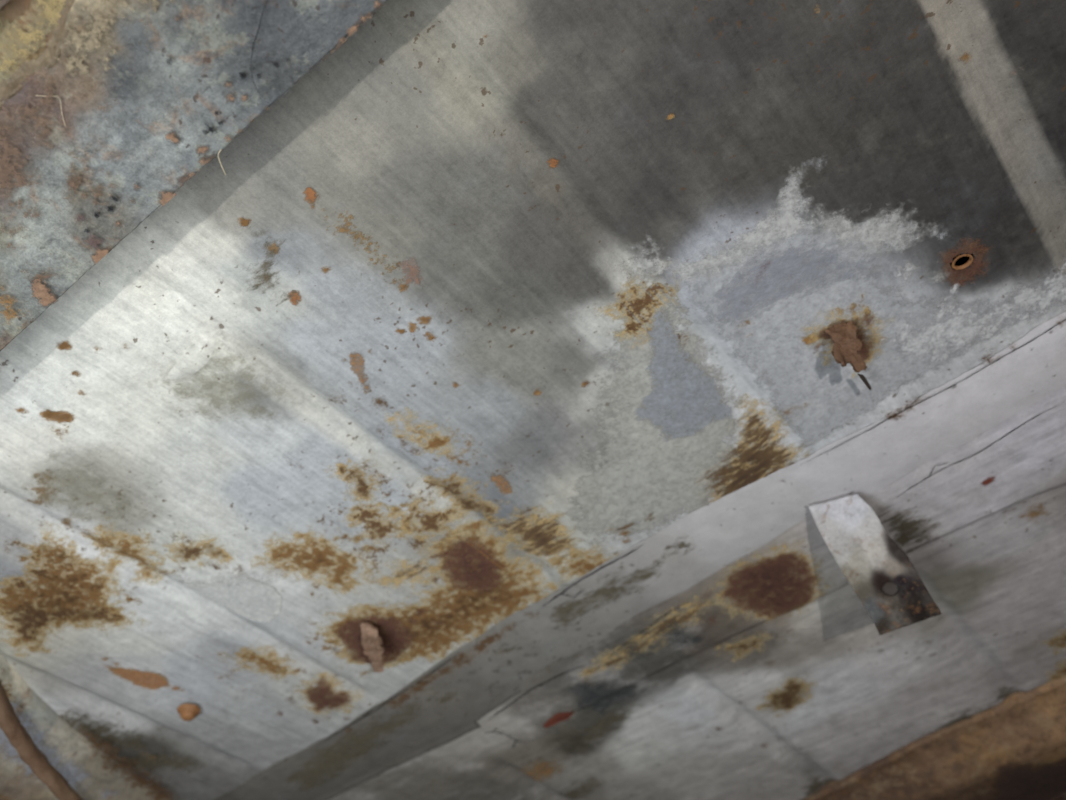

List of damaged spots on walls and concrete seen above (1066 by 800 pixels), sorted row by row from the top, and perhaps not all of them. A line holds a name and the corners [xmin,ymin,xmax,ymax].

rust [349,351,387,406]
rust [396,316,435,340]
rust [605,281,675,341]
damp [568,176,1066,544]
rust [802,295,885,365]
rust [700,396,807,503]
rust [0,518,243,656]
rust [235,409,634,732]
rust [581,545,828,686]
rust [756,678,811,717]
damp [991,760,1066,800]